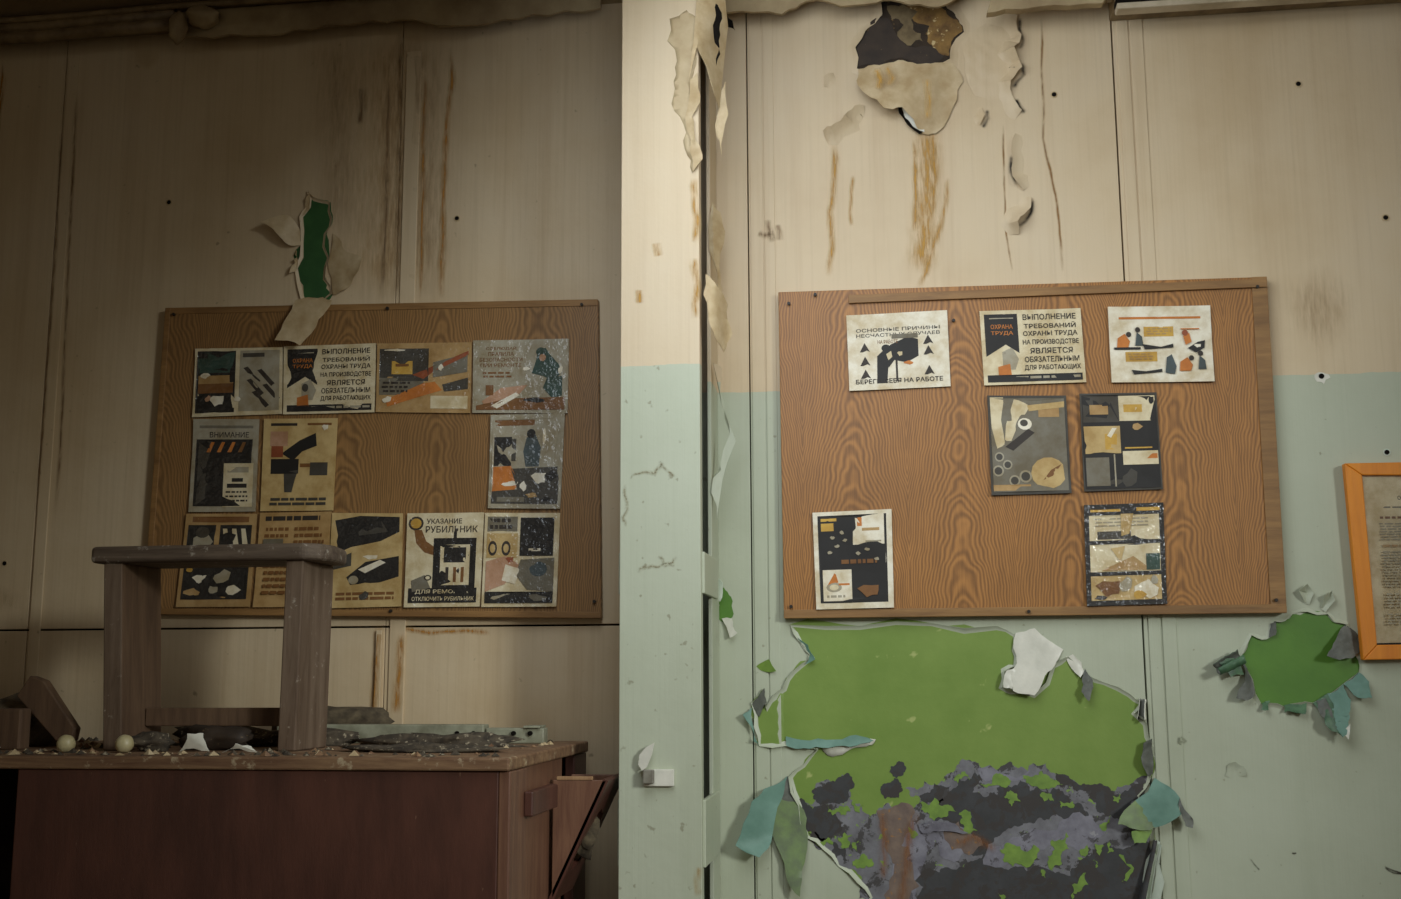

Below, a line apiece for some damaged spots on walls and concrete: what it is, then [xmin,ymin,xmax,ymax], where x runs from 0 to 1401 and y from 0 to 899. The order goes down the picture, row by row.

peeling [261,191,363,345]
rust [440,68,453,274]
peeling [668,0,728,173]
peeling [848,1,970,135]
rust [914,139,948,277]
peeling [973,14,1033,235]
peeling [703,203,736,520]
peeling [735,618,1194,899]
peeling [1213,607,1372,739]